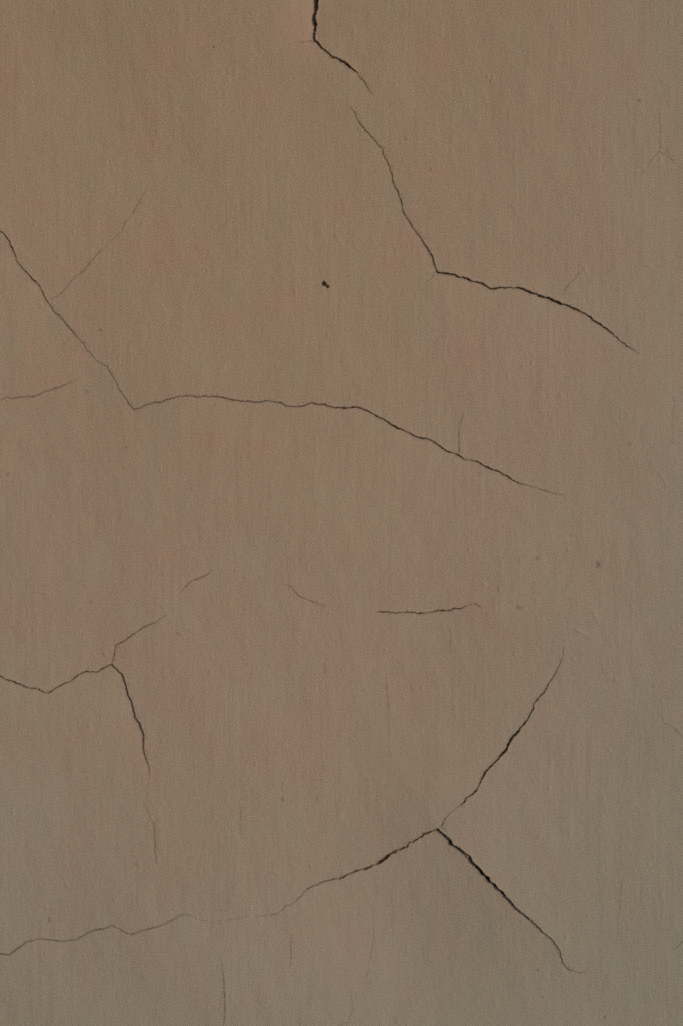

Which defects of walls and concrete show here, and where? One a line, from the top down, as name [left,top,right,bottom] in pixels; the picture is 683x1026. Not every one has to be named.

crack [312,0,640,355]
crack [0,229,541,490]
crack [0,615,167,779]
crack [278,646,586,974]